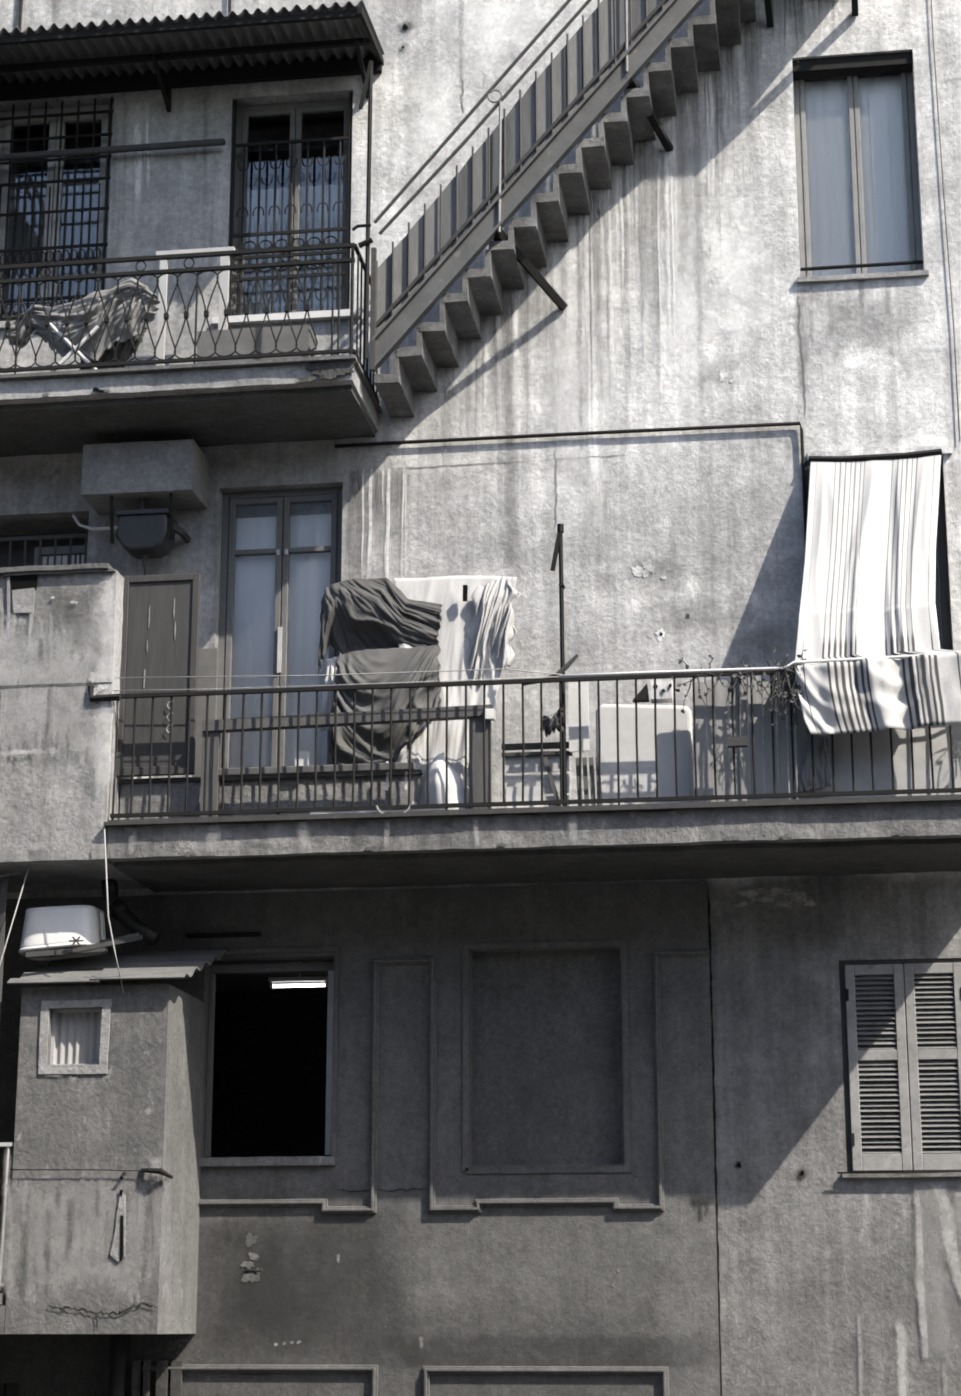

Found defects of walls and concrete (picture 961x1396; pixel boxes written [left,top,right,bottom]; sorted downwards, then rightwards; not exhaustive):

water stain [362,470,407,578]
crack [48,1302,157,1330]
water stain [896,1183,961,1396]